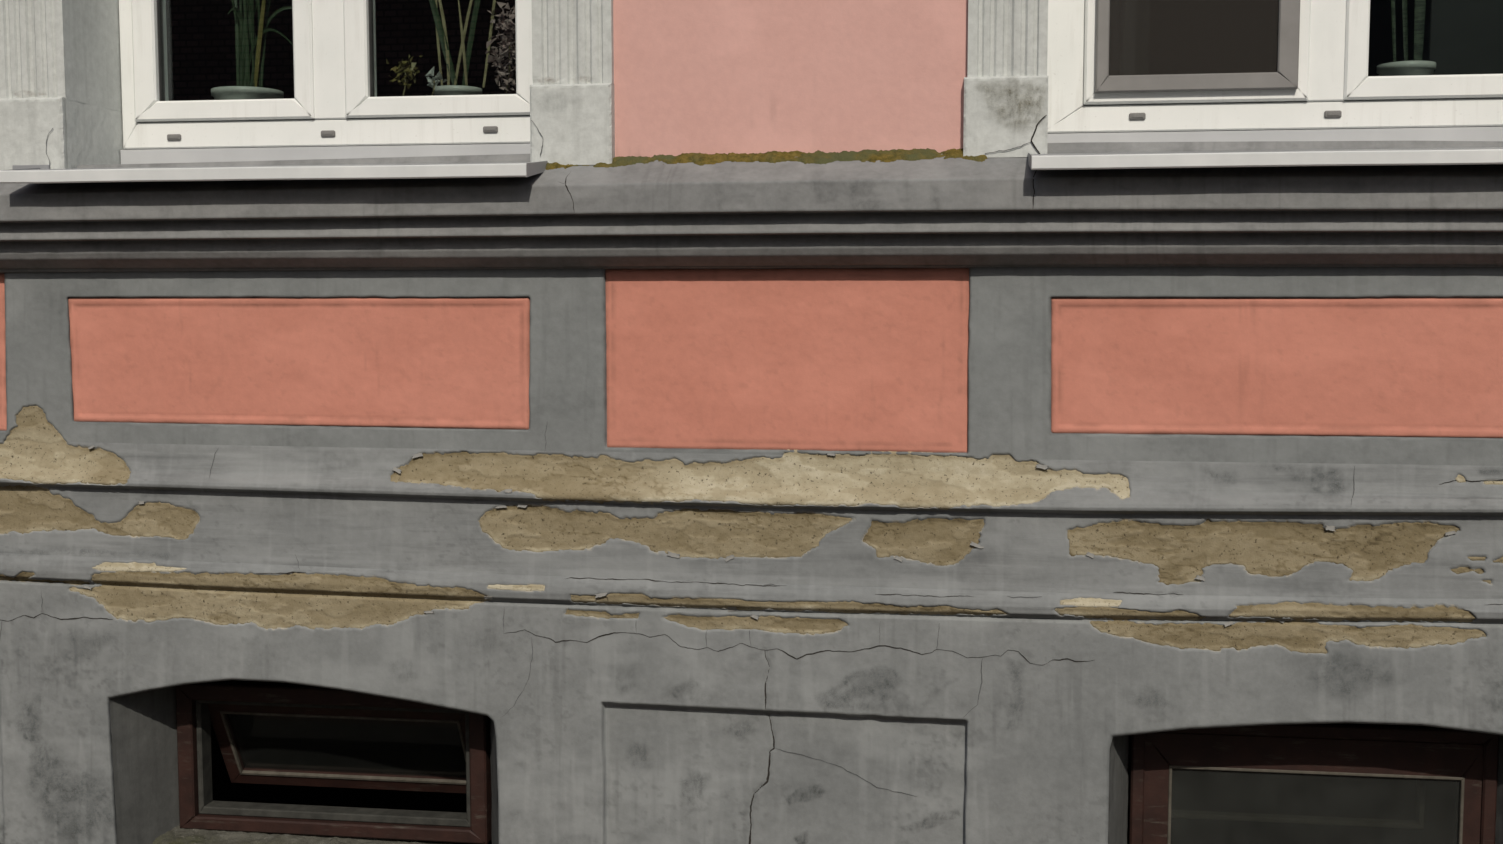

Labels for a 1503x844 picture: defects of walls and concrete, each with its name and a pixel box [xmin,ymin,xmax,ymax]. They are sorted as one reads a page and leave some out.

peeling [0,405,200,540]
peeling [390,449,1130,566]
peeling [0,562,545,630]
crack [567,577,783,586]
peeling [565,592,1007,635]
crack [1113,589,1182,597]
peeling [1067,519,1460,585]
peeling [1055,598,1486,654]
crack [502,594,1093,844]